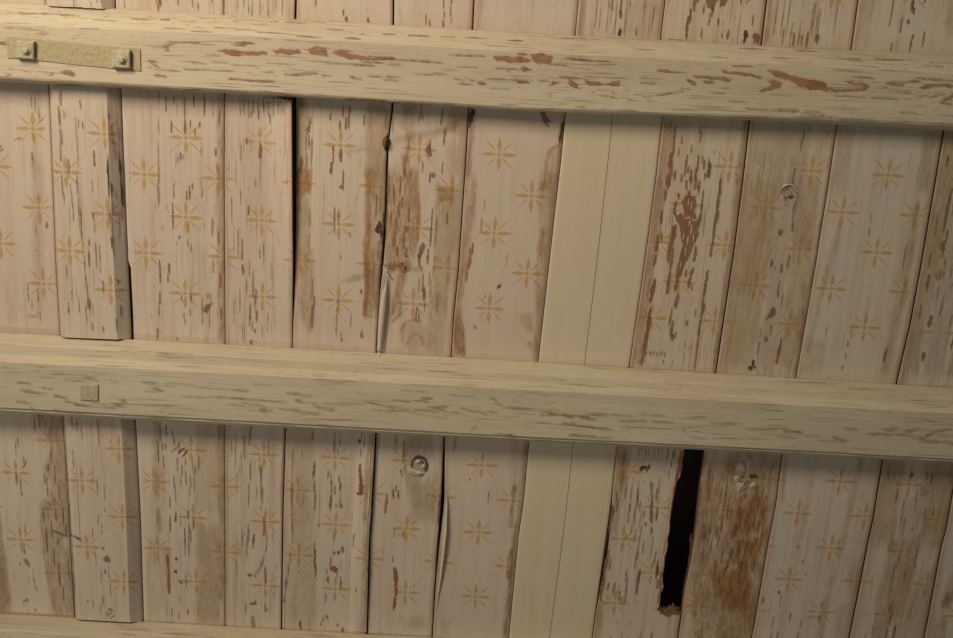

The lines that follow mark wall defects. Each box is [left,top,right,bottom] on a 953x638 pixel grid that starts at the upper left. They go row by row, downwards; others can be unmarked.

peeling [639,65,953,101]
peeling [639,126,721,369]
leakage [692,469,770,638]